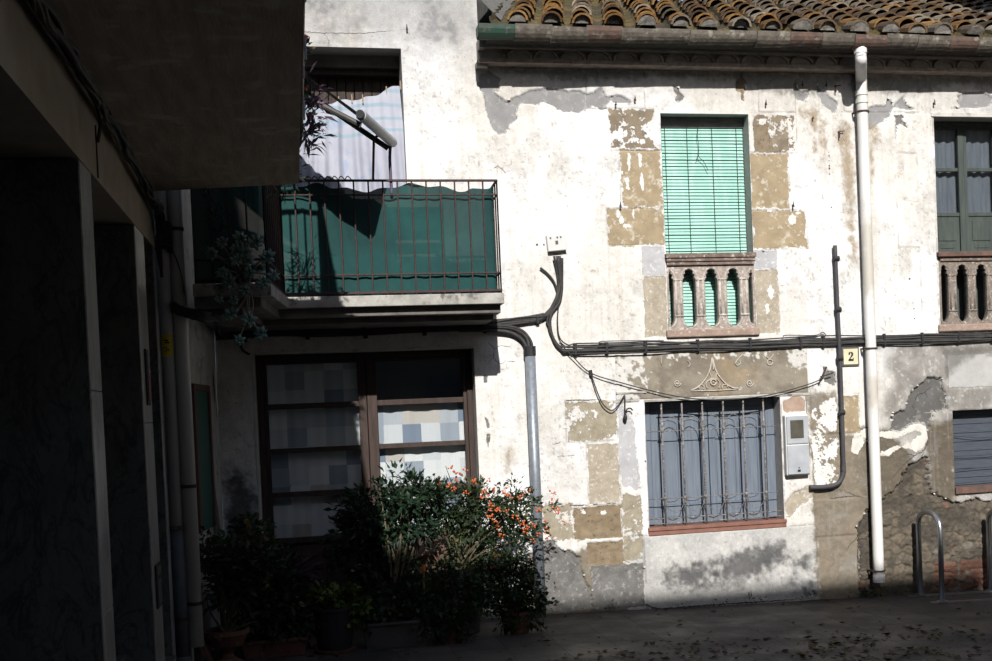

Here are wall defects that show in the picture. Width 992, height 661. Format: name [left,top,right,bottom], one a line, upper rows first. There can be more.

peeling [478,71,665,248]
peeling [749,114,809,250]
peeling [868,97,913,130]
peeling [951,90,992,109]
spalling [542,400,646,613]
damp [666,545,784,587]
peeling [783,365,868,518]
spalling [879,377,946,456]